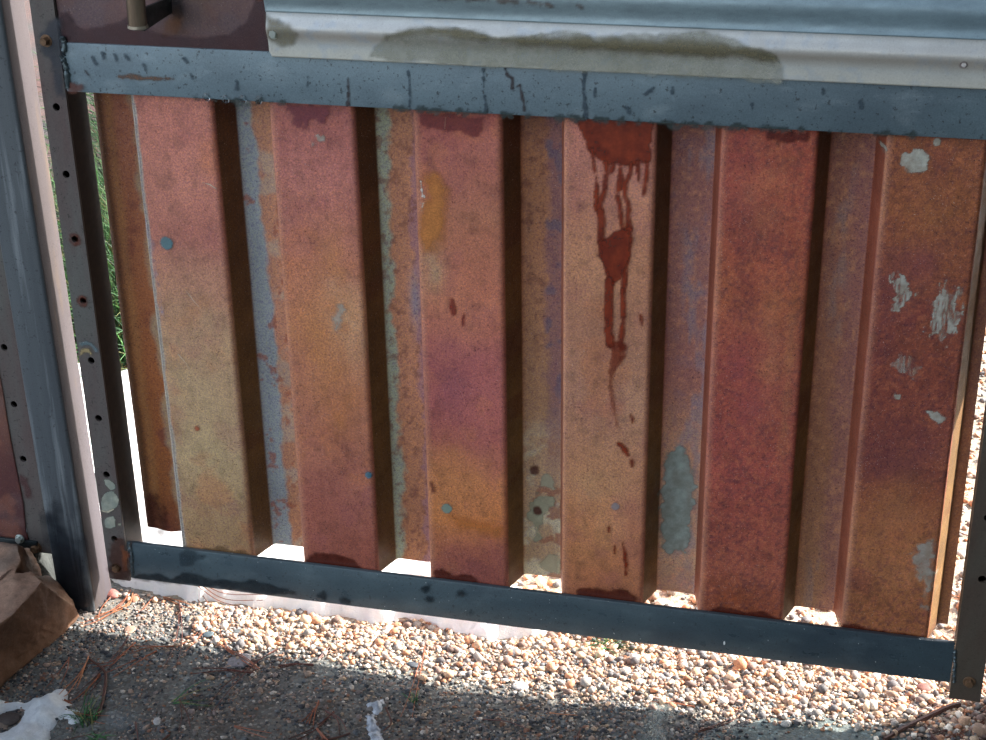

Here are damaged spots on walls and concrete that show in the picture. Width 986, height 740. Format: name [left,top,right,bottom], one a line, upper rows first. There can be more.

water stain [371,29,782,136]
peeling [900,138,940,172]
rust [420,174,445,249]
rust [577,119,654,386]
peeling [889,274,916,312]
peeling [923,283,964,335]
peeling [927,411,945,423]
rust [0,377,30,540]
peeling [660,446,698,554]
rust [108,539,130,580]